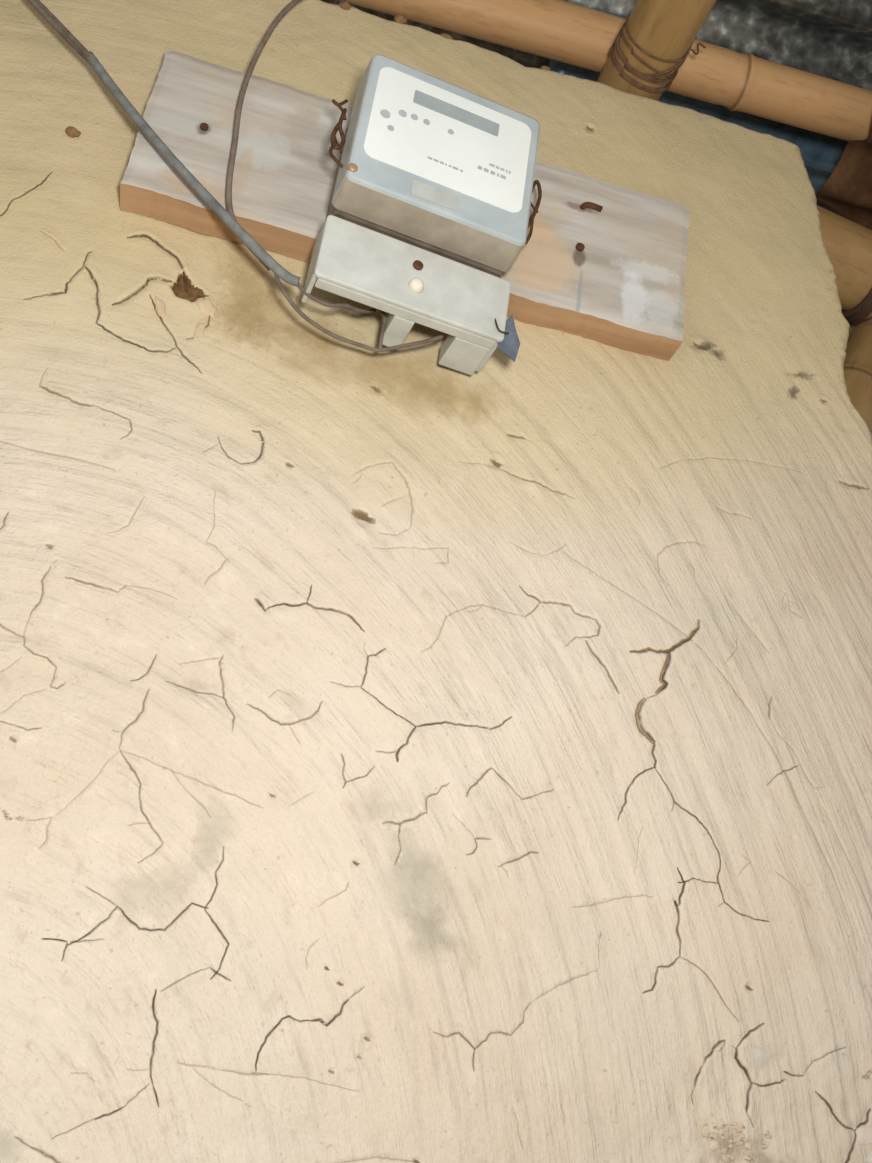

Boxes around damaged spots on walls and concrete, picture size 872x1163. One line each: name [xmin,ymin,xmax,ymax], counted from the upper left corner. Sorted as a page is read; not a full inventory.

crack [29,235,210,371]
crack [257,585,511,787]
crack [522,589,769,997]
crack [43,860,229,1124]
crack [255,999,349,1068]
crack [459,1018,524,1068]
crack [695,1023,870,1163]